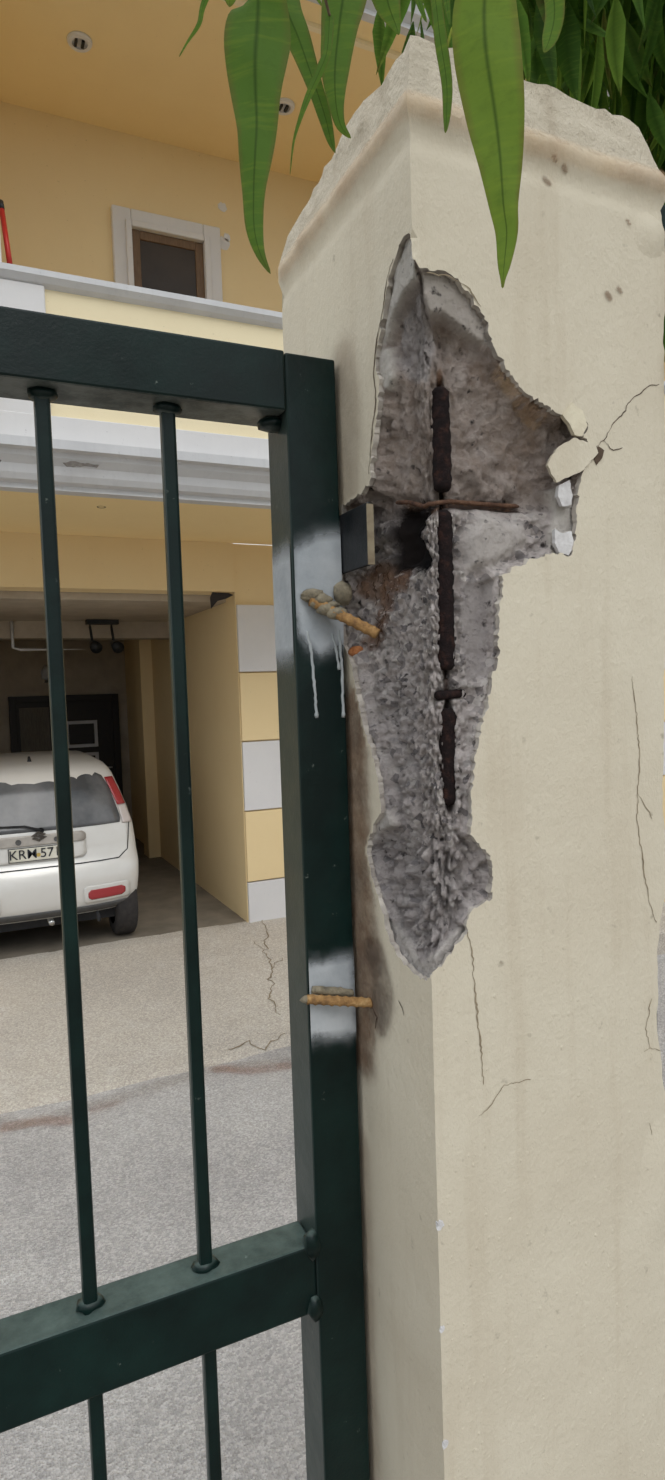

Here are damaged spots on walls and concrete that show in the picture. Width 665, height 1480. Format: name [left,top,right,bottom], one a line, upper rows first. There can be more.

spalling [344,238,604,977]
crack [596,384,659,451]